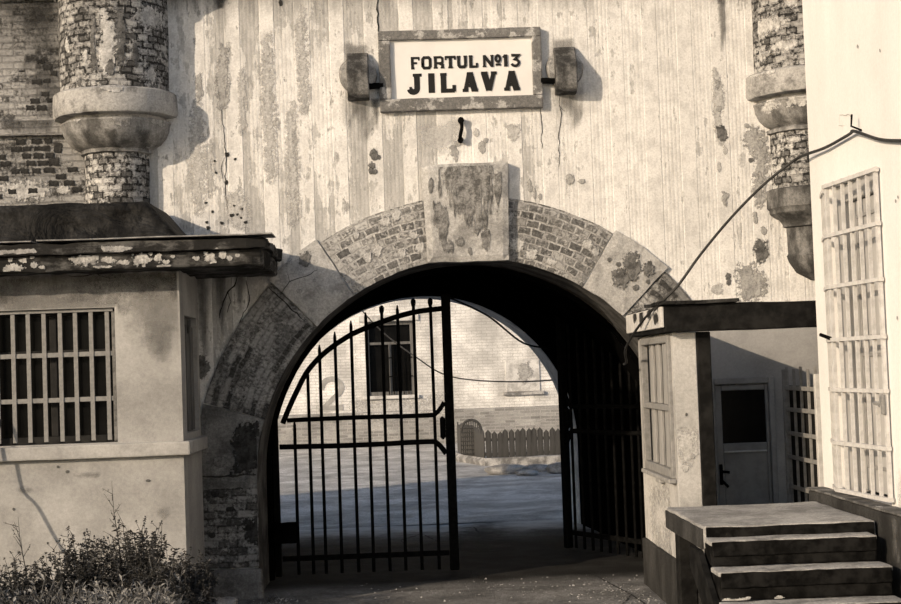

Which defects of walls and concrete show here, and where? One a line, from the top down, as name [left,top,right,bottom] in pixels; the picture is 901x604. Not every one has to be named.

peeling [82,4,162,92]
flaking render [26,59,57,111]
flaking render [0,138,82,199]
peeling [0,248,45,272]
peeling [68,246,175,269]
peeling [192,248,240,264]